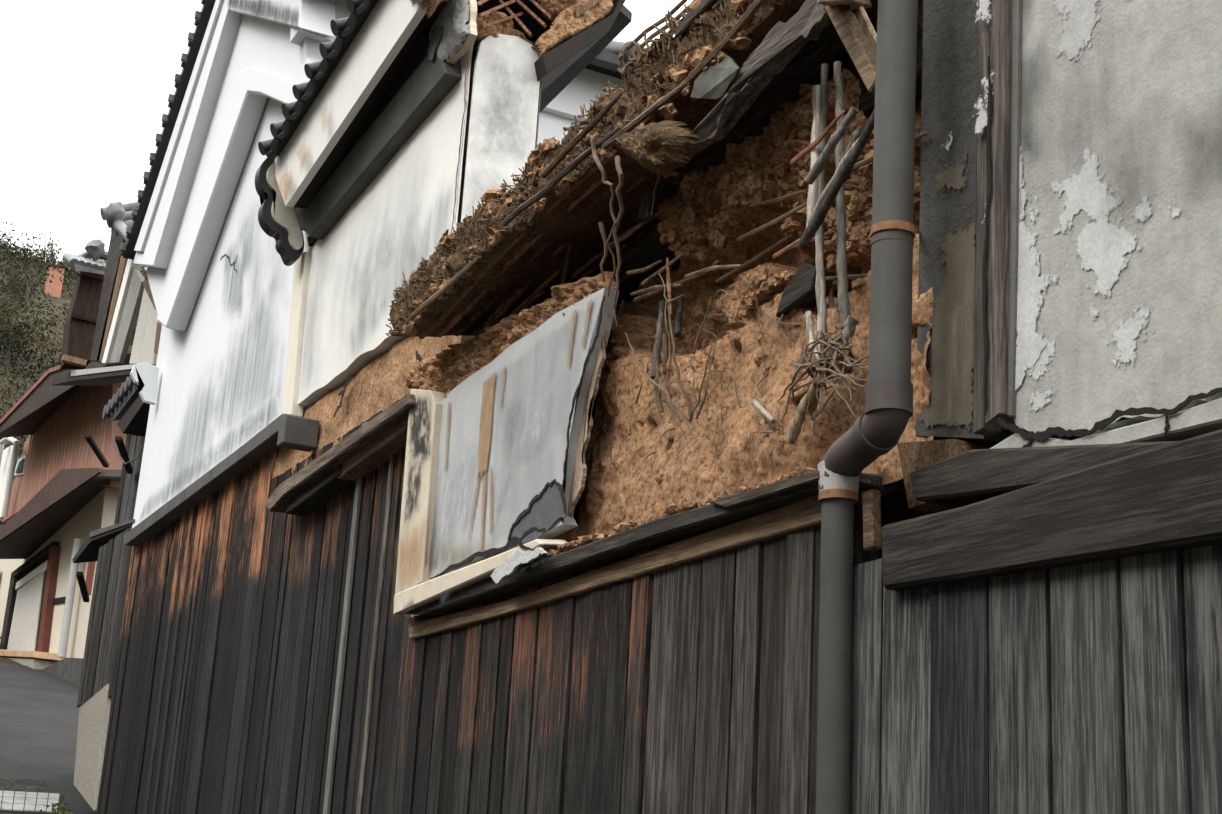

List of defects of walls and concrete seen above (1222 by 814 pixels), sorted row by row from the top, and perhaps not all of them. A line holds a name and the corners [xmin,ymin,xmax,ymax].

peeling [428,0,477,64]
peeling [975,0,991,23]
peeling [1052,0,1102,61]
peeling [973,72,997,134]
peeling [1050,146,1153,320]
peeling [1015,146,1059,414]
spalling [491,300,614,584]